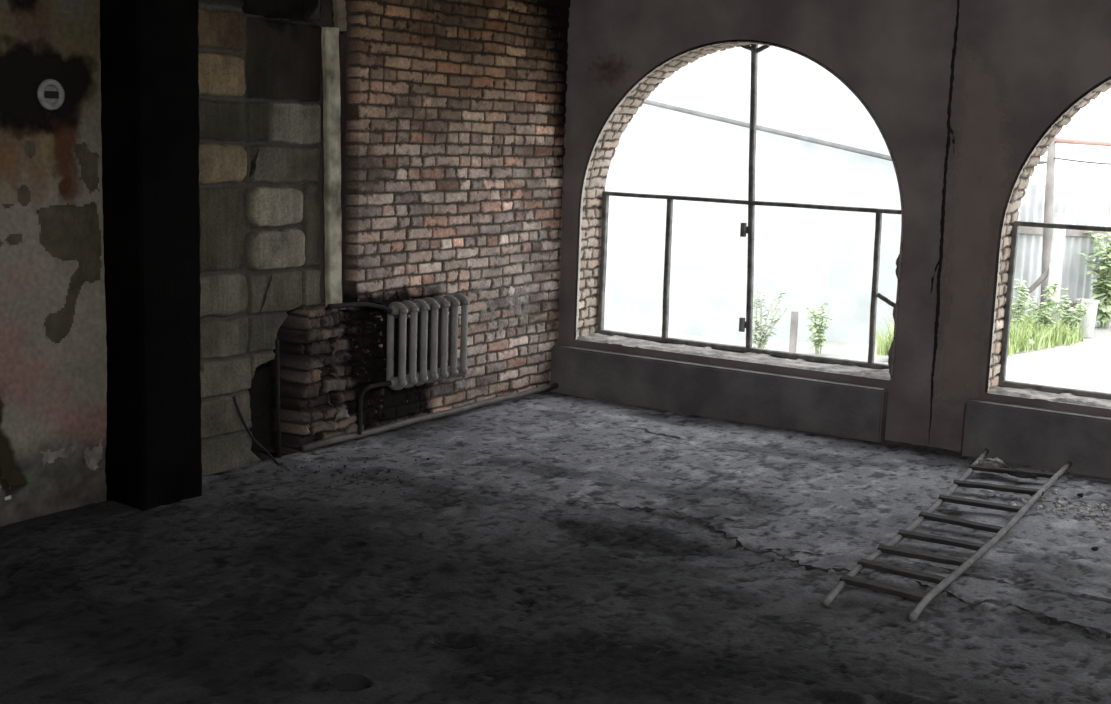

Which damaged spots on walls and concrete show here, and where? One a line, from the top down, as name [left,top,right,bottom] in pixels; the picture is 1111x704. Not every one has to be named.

flaking render [0,141,102,344]